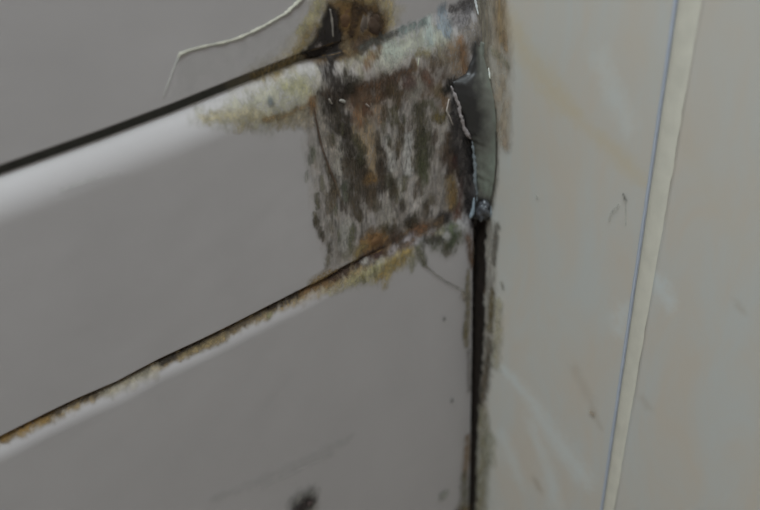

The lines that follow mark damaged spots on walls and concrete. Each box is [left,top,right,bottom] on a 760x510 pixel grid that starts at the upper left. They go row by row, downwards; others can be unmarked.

leakage [205,0,474,288]
rust [0,231,393,442]
leakage [475,220,503,510]